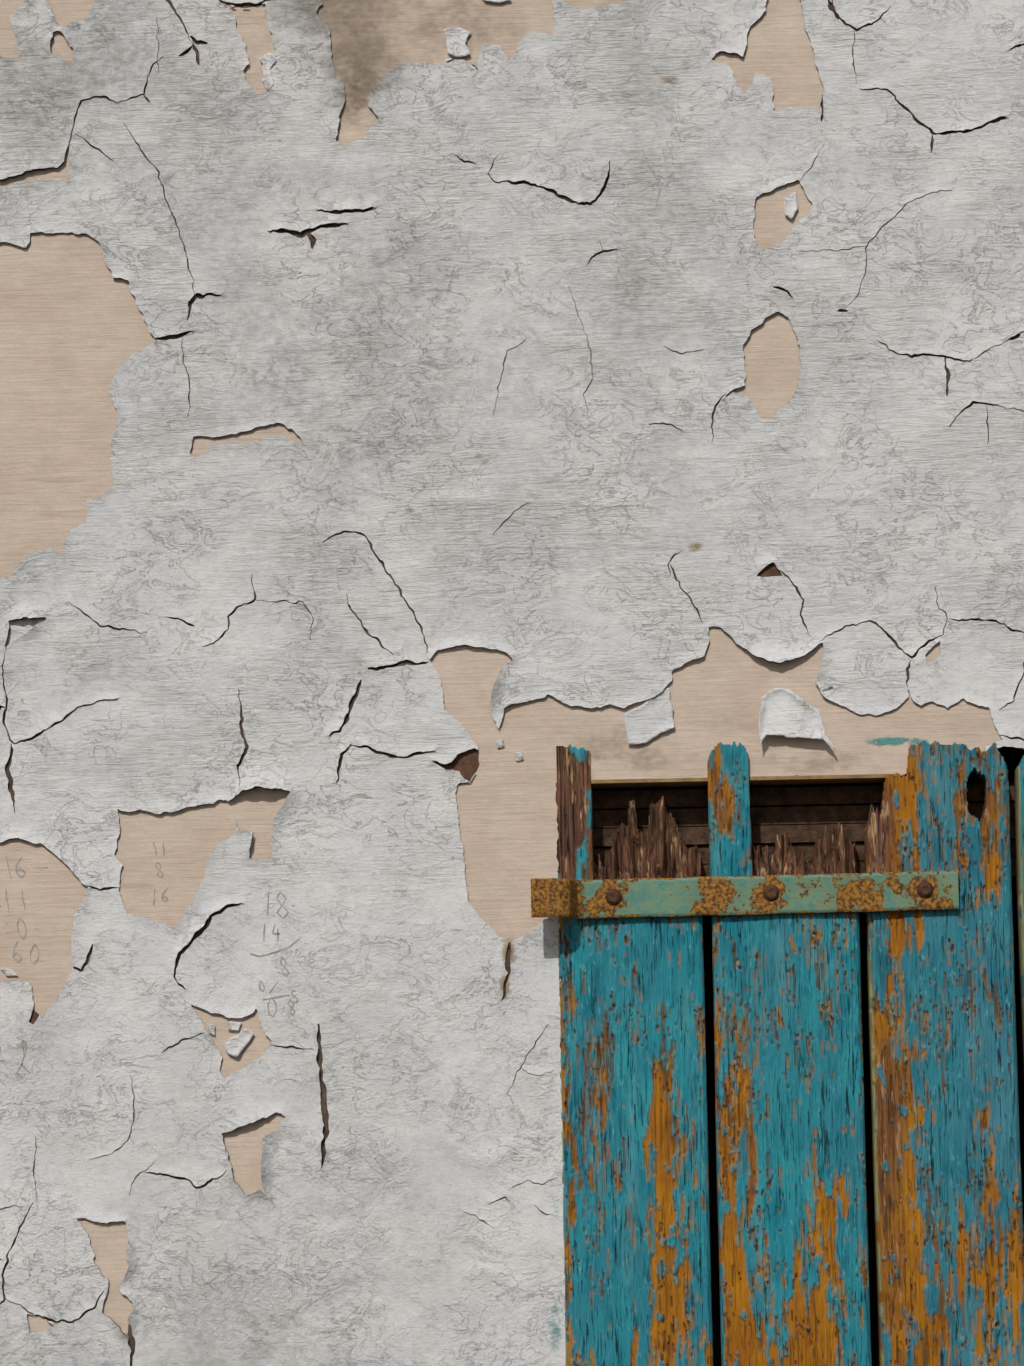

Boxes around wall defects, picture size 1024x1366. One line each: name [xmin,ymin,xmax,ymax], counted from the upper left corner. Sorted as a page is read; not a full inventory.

peeling [710,0,828,110]
crack [825,0,1011,153]
crack [455,155,610,205]
peeling [748,176,816,249]
peeling [0,226,156,578]
crack [0,647,120,810]
crack [69,583,314,647]
peeling [111,766,302,932]
crack [322,531,441,785]
peeling [425,620,1002,943]
peeling [213,1103,292,1203]
crack [270,1016,329,1173]